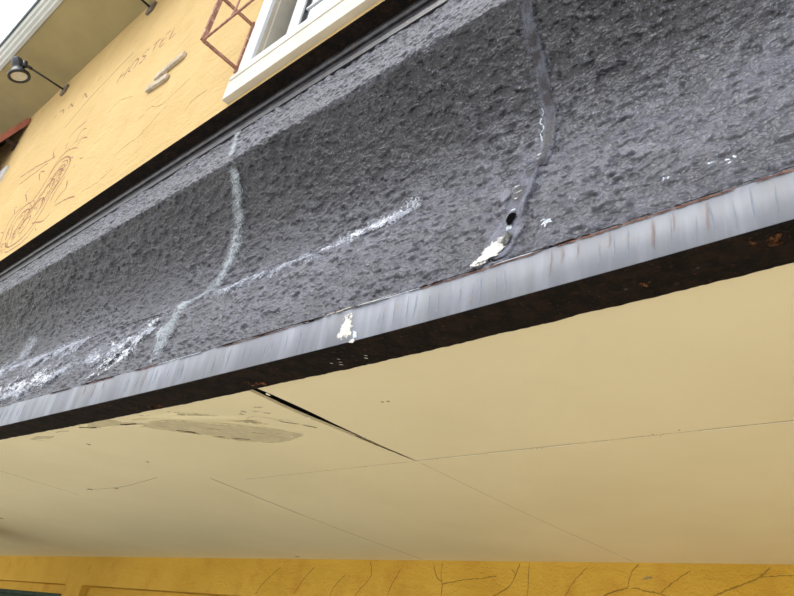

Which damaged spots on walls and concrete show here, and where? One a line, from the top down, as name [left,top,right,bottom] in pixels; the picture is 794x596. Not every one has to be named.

crack [352,0,794,308]
spalling [470,208,524,267]
damp [0,170,422,400]
crack [135,316,322,371]
spalling [324,293,395,343]
crack [51,375,115,394]
peeling [78,414,303,443]
crack [211,389,794,596]